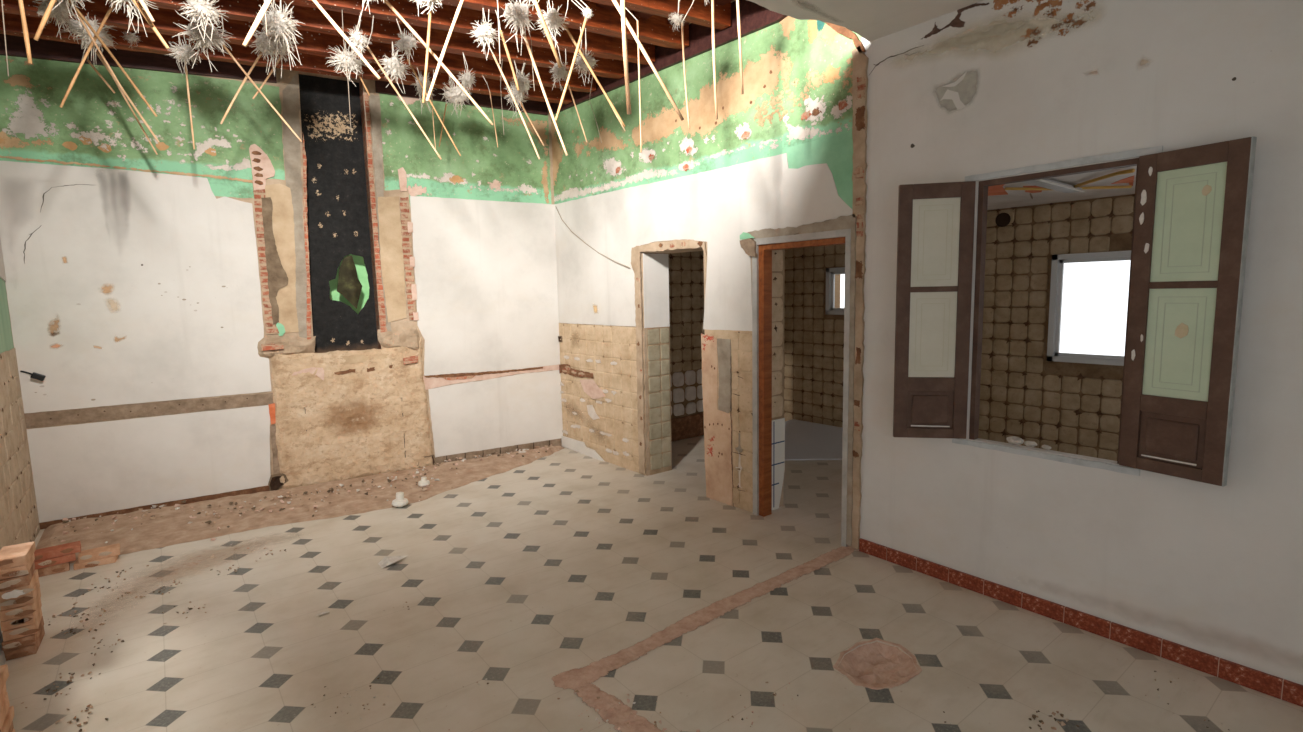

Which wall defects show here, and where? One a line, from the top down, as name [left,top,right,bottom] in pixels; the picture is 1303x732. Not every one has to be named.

flaking render [922,0,1099,47]
flaking render [0,59,435,491]
flaking render [363,16,869,550]